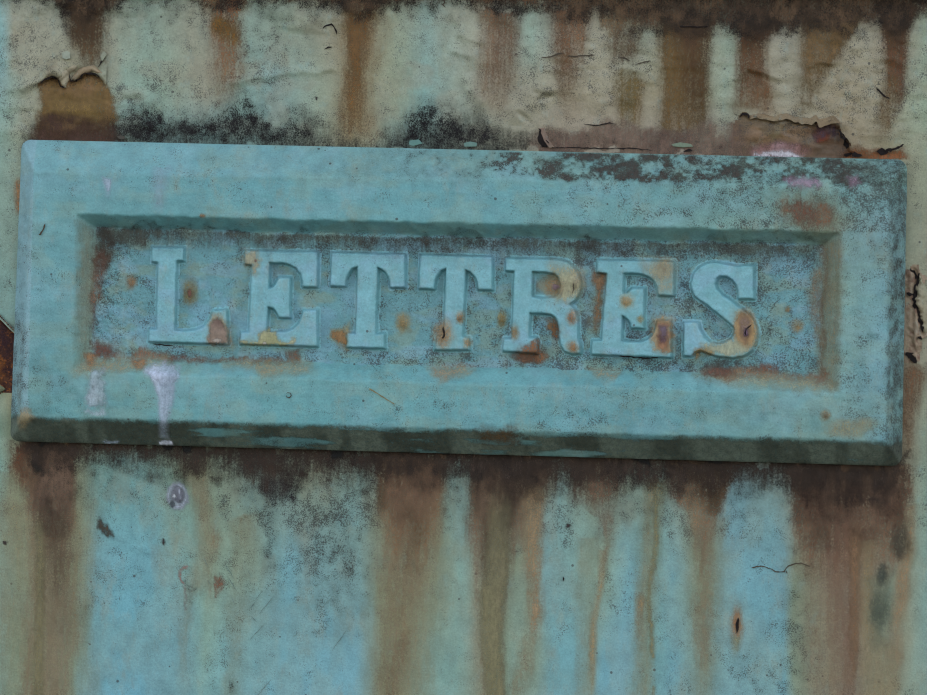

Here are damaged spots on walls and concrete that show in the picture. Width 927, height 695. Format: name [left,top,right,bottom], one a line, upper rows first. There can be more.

corrosion [29,0,124,142]
corrosion [344,3,375,134]
leakage [105,93,358,147]
peeling [733,112,906,159]
peeling [0,314,15,394]
corrosion [512,338,548,363]
corrosion [547,310,575,339]
corrosion [545,267,583,301]
corrosion [593,274,606,322]
peeling [904,264,927,364]
corrosion [669,460,730,669]
corrosion [792,464,913,695]